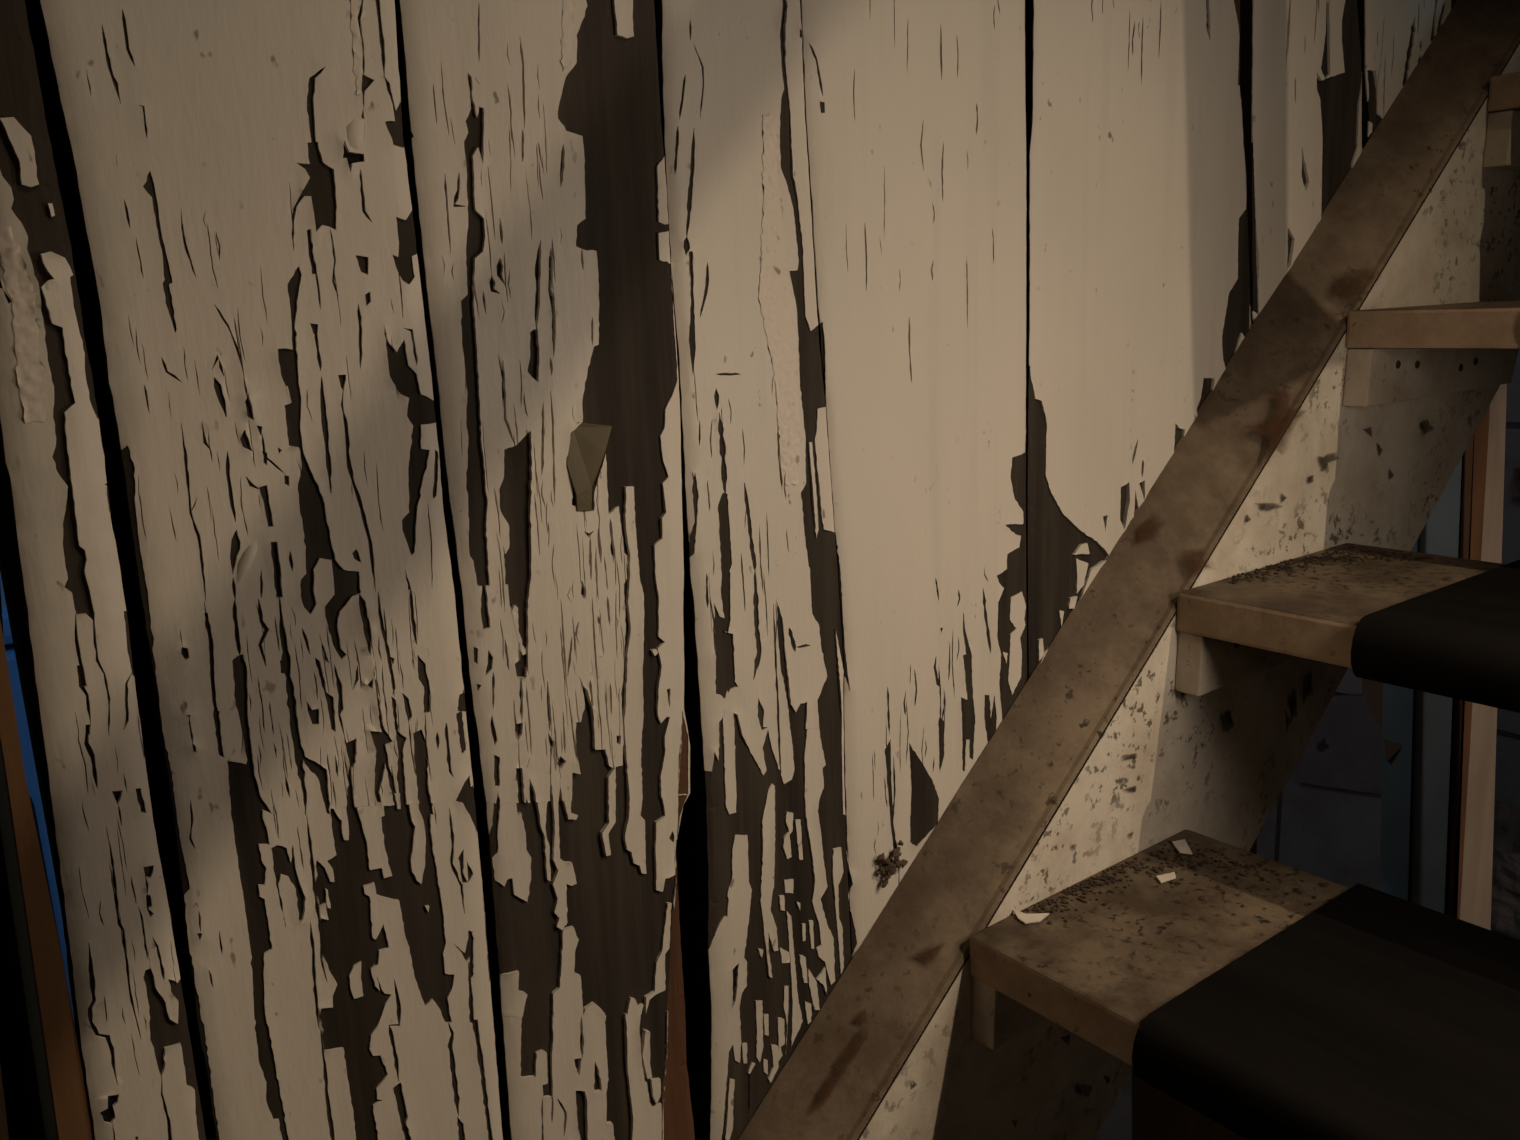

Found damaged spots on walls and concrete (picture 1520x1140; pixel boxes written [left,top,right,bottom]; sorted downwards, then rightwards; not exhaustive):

peeling [0,0,99,625]
peeling [213,356,226,416]
peeling [1197,378,1212,412]
peeling [1253,402,1303,460]
peeling [1308,454,1338,482]
peeling [1103,482,1142,525]
peeling [1246,493,1287,522]
peeling [215,0,857,1140]
peeling [961,367,1107,771]